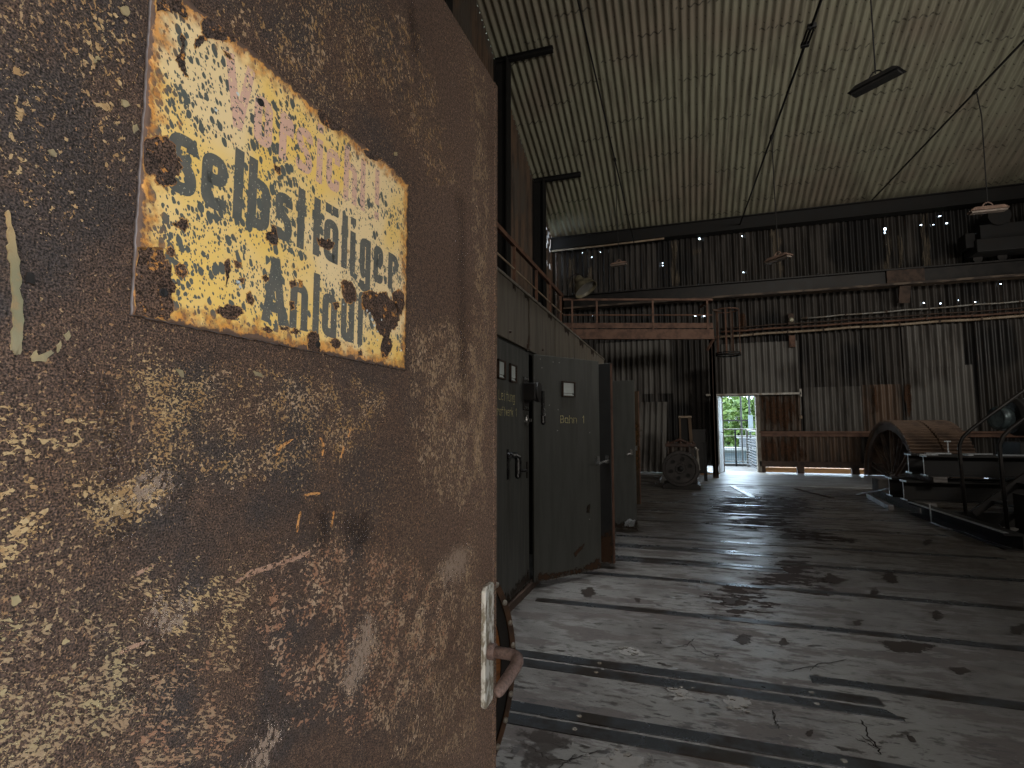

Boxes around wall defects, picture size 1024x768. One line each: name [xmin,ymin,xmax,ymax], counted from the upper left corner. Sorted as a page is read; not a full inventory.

peeling [0,0,144,236]
peeling [0,57,494,768]
leakage [703,493,858,545]
leakage [699,554,833,618]
crack [857,719,881,754]